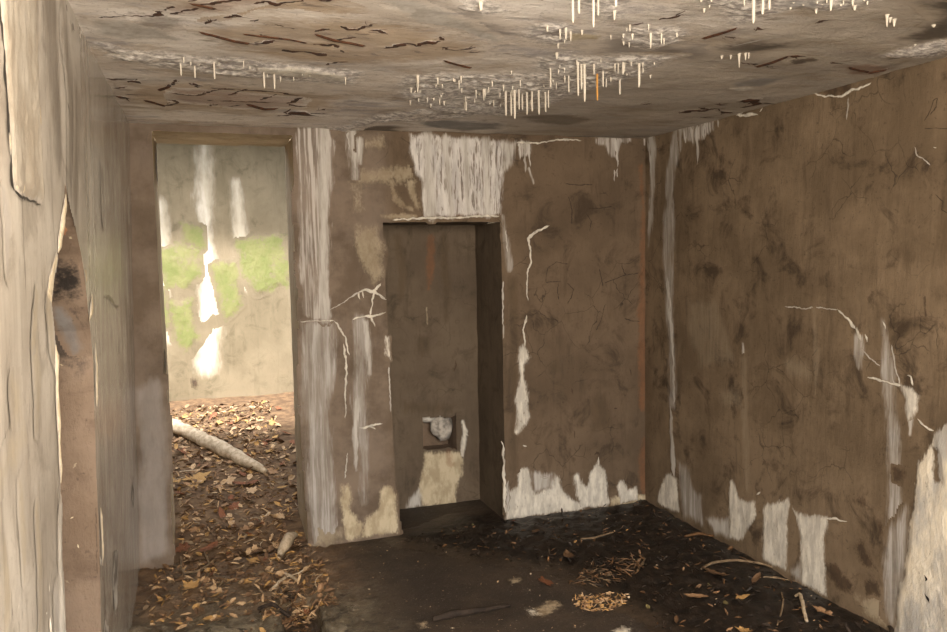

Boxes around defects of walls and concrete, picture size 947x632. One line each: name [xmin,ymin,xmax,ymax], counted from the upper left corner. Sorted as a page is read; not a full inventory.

crack [0,2,41,206]
leakage [43,0,82,230]
leakage [81,17,375,86]
leakage [135,145,252,569]
leakage [291,0,947,632]